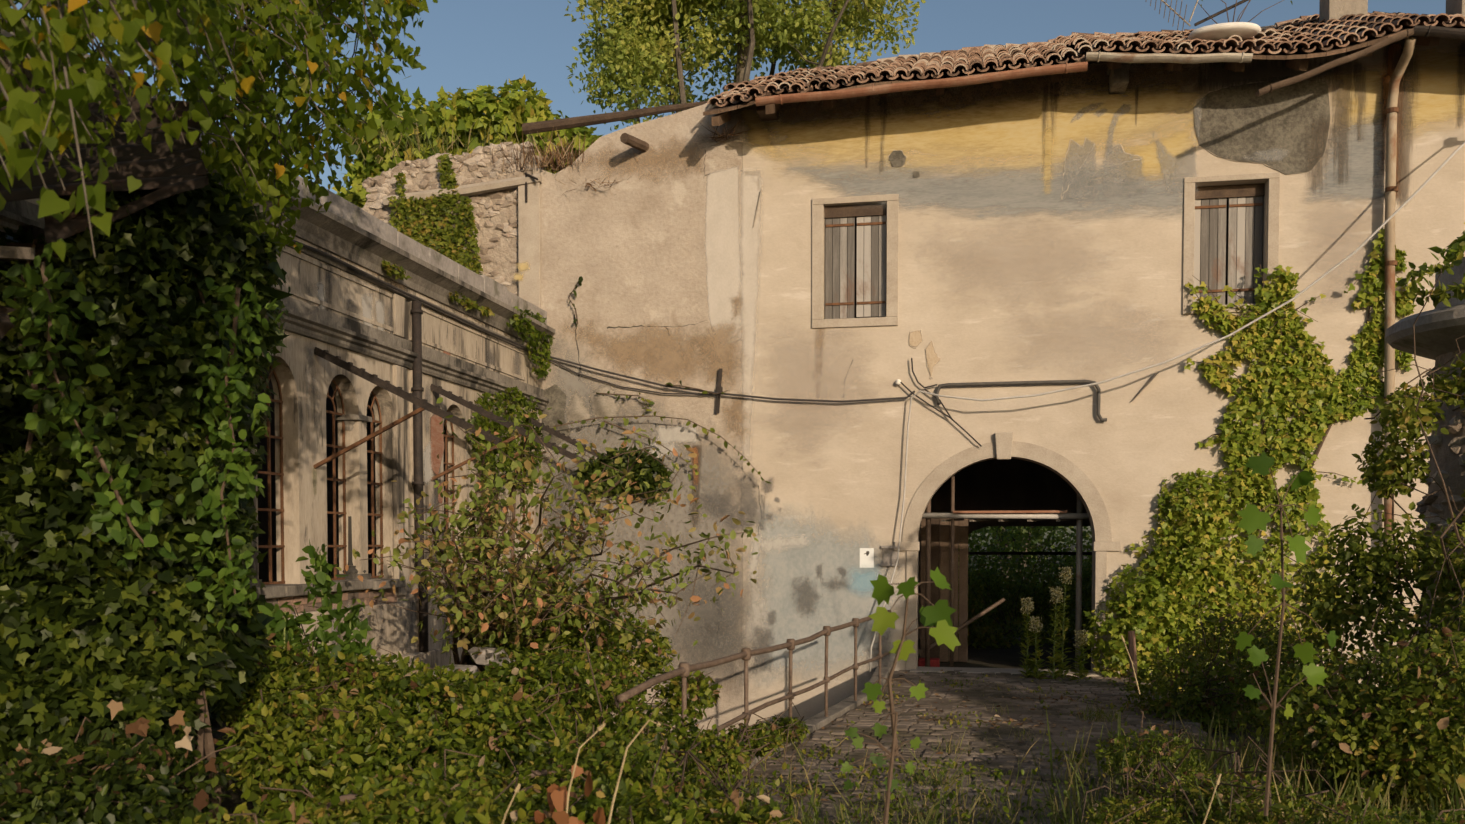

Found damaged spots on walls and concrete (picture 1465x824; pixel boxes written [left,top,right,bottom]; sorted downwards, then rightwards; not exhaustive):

peeling [741,69,1383,200]
water stain [780,60,1384,217]
water stain [546,363,891,673]